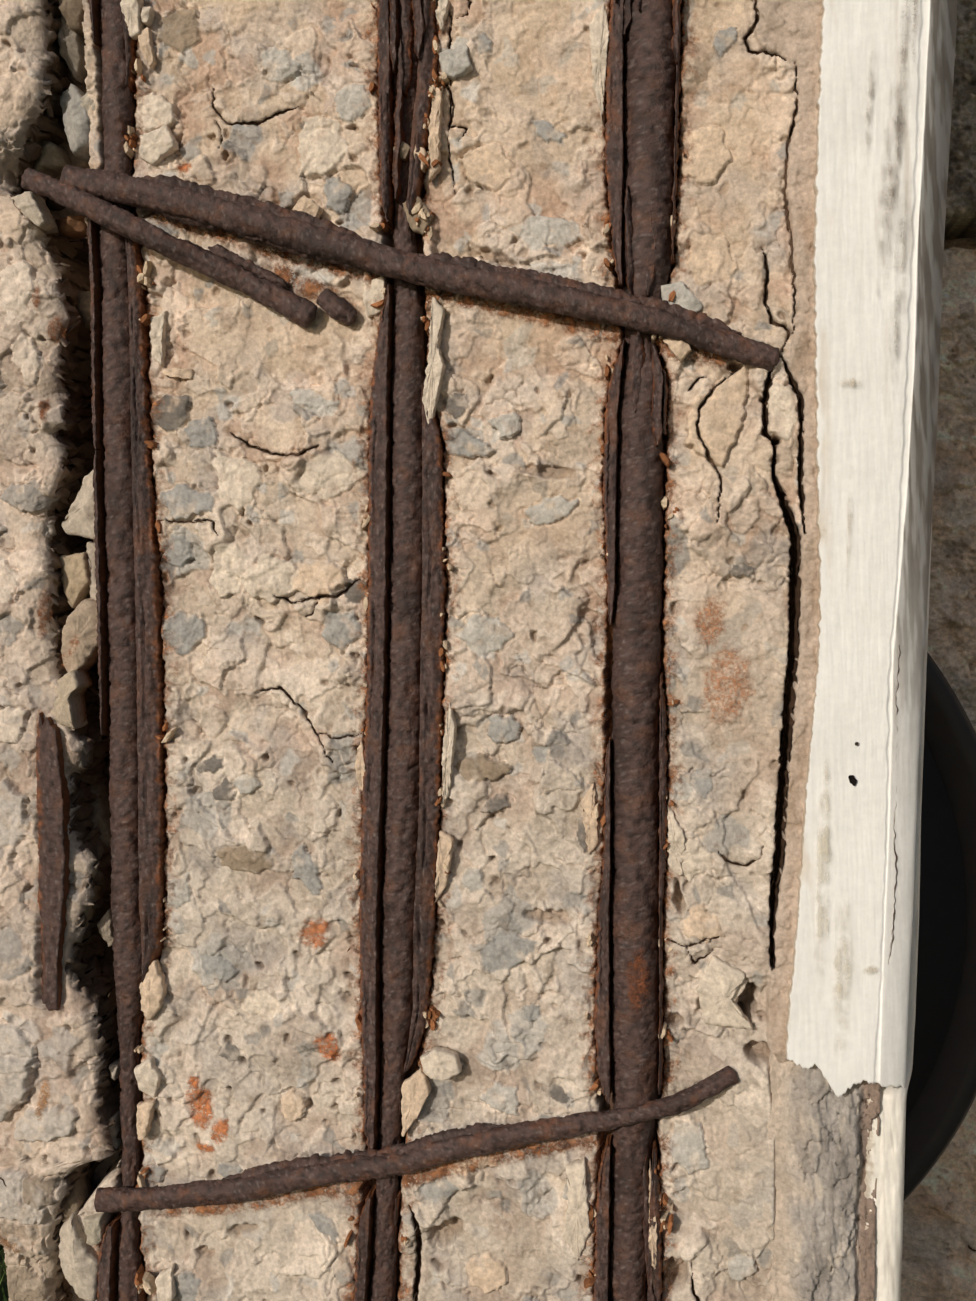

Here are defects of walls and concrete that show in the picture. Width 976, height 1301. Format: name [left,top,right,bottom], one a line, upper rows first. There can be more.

corrosion [152,212,394,300]
corrosion [598,93,619,283]
corrosion [667,0,693,284]
spalling [58,0,823,1301]
corrosion [420,285,626,1094]
corrosion [654,336,728,838]
crack [689,0,806,966]
spalling [35,712,71,1011]
corrosion [185,1077,228,1152]
crack [409,1205,422,1301]
corrosion [629,854,678,1094]
flaking render [767,1052,881,1301]